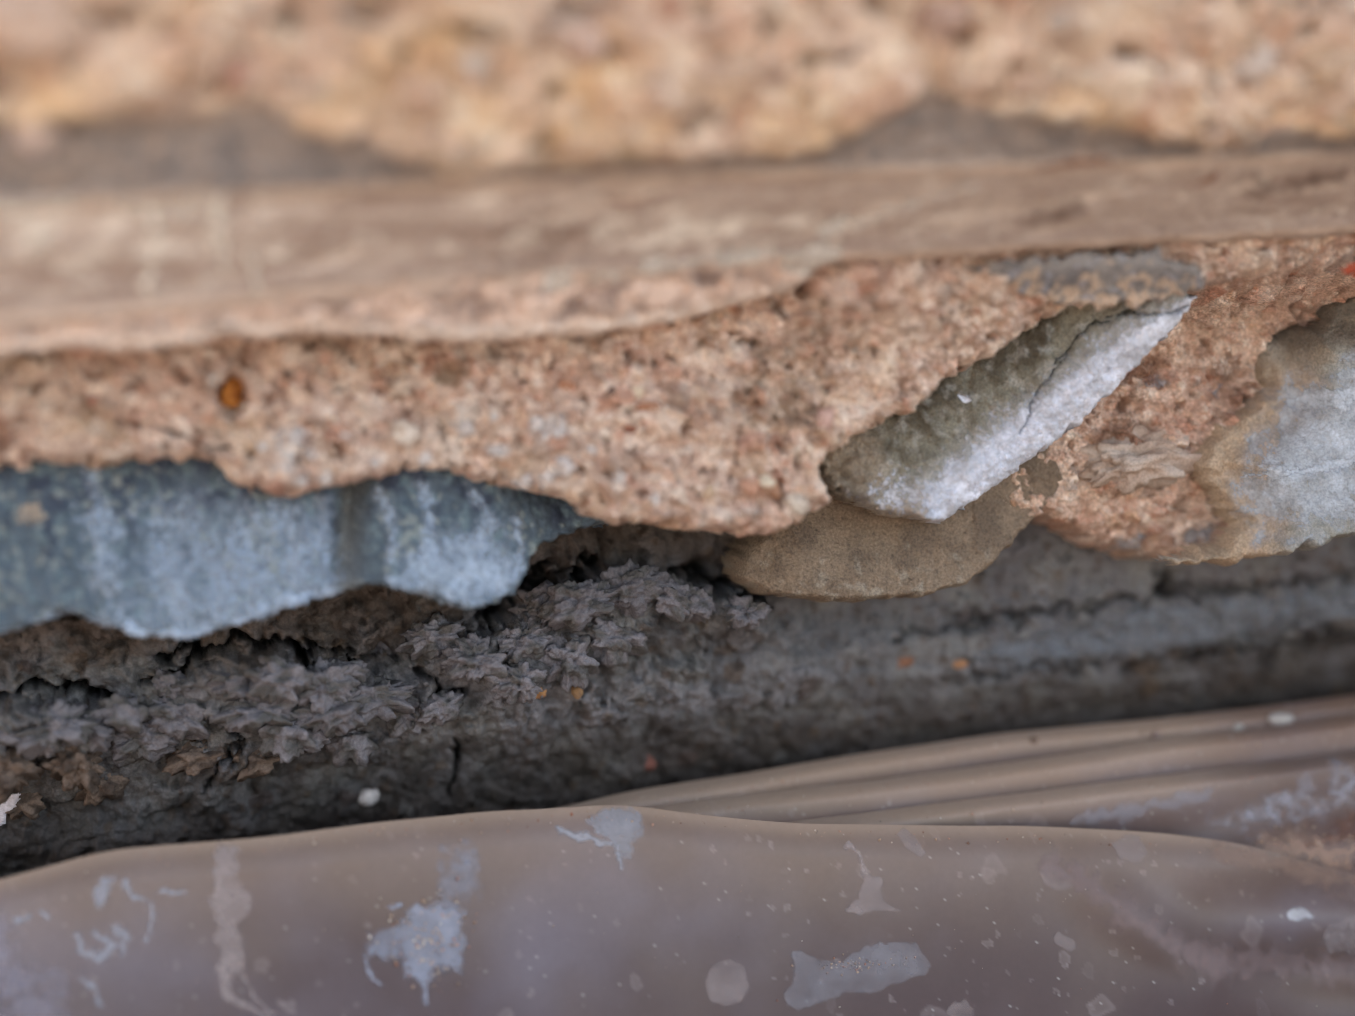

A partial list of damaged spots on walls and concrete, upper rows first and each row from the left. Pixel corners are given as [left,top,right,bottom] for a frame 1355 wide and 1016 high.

damp [1261,835,1355,867]